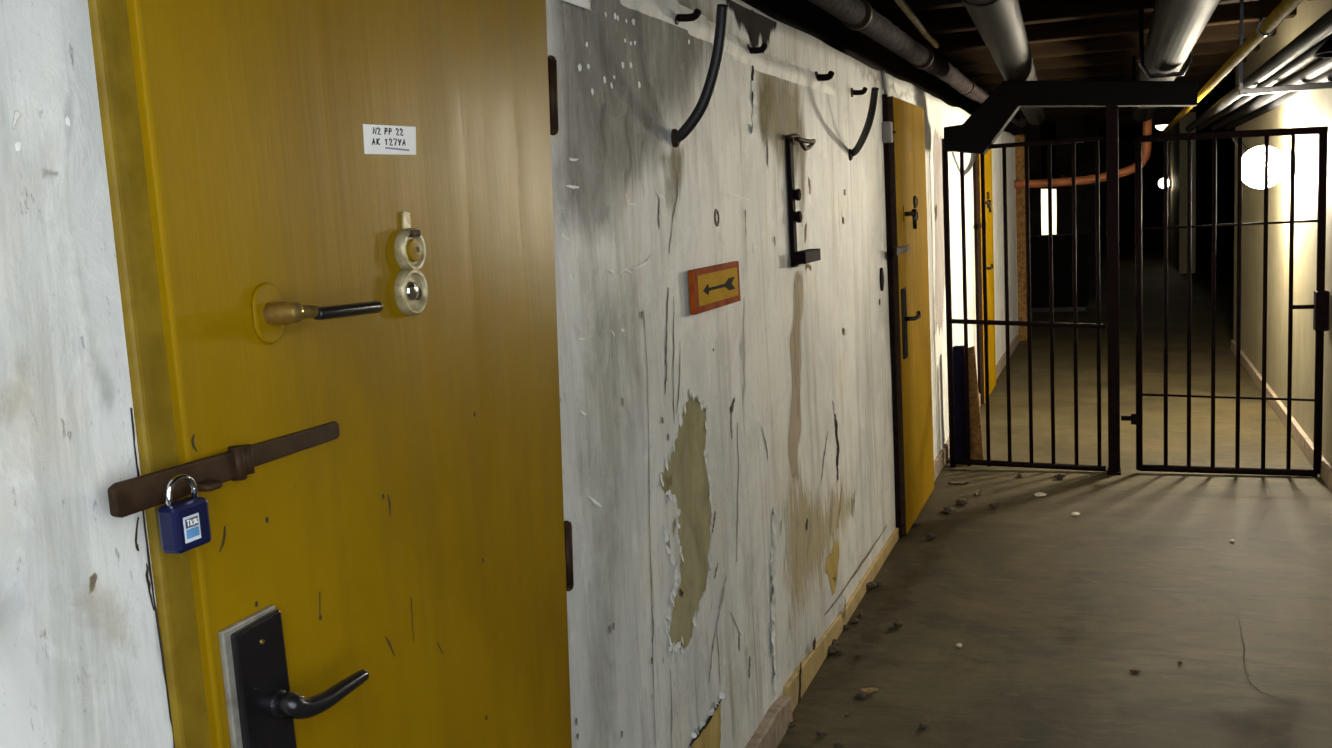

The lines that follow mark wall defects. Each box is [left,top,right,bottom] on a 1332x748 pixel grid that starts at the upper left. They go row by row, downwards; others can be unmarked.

peeling [660,388,713,654]
peeling [770,484,855,696]
spalling [690,692,725,748]